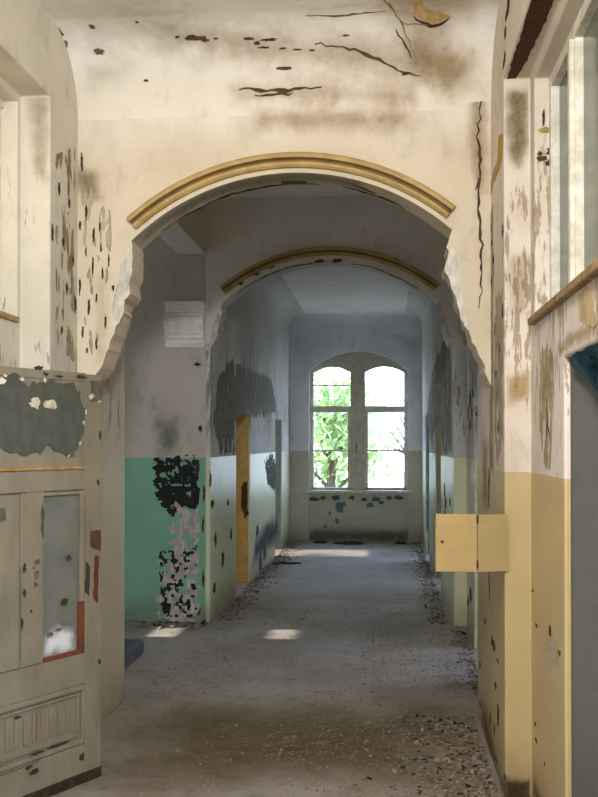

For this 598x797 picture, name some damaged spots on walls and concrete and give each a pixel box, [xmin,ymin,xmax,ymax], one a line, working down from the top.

peeling [175,34,218,42]
peeling [244,37,315,51]
crack [306,0,426,76]
crack [239,86,322,97]
water stain [510,93,526,159]
crack [475,101,484,308]
peeling [51,148,131,362]
peeling [489,204,503,471]
peeling [0,365,102,458]
peeling [540,344,554,470]
peeling [152,454,216,622]
peeling [241,482,249,519]